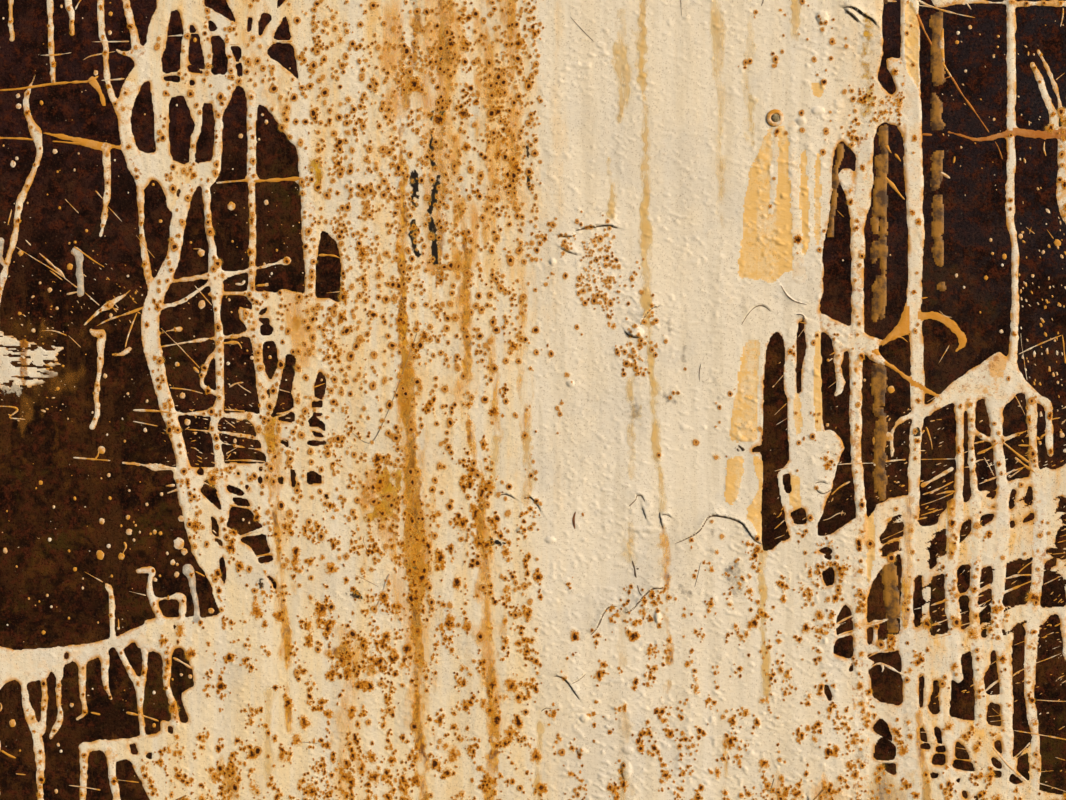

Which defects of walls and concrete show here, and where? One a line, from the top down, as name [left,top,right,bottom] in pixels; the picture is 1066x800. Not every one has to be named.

peeling [130,81,156,153]
peeling [161,10,228,75]
peeling [169,86,299,184]
rust [779,0,848,85]
rust [820,16,915,171]
rust [140,0,680,800]
peeling [724,320,823,551]
crack [590,561,662,635]
crack [629,490,763,545]
rust [939,498,959,602]
peeling [866,363,1066,795]
rust [606,514,958,800]